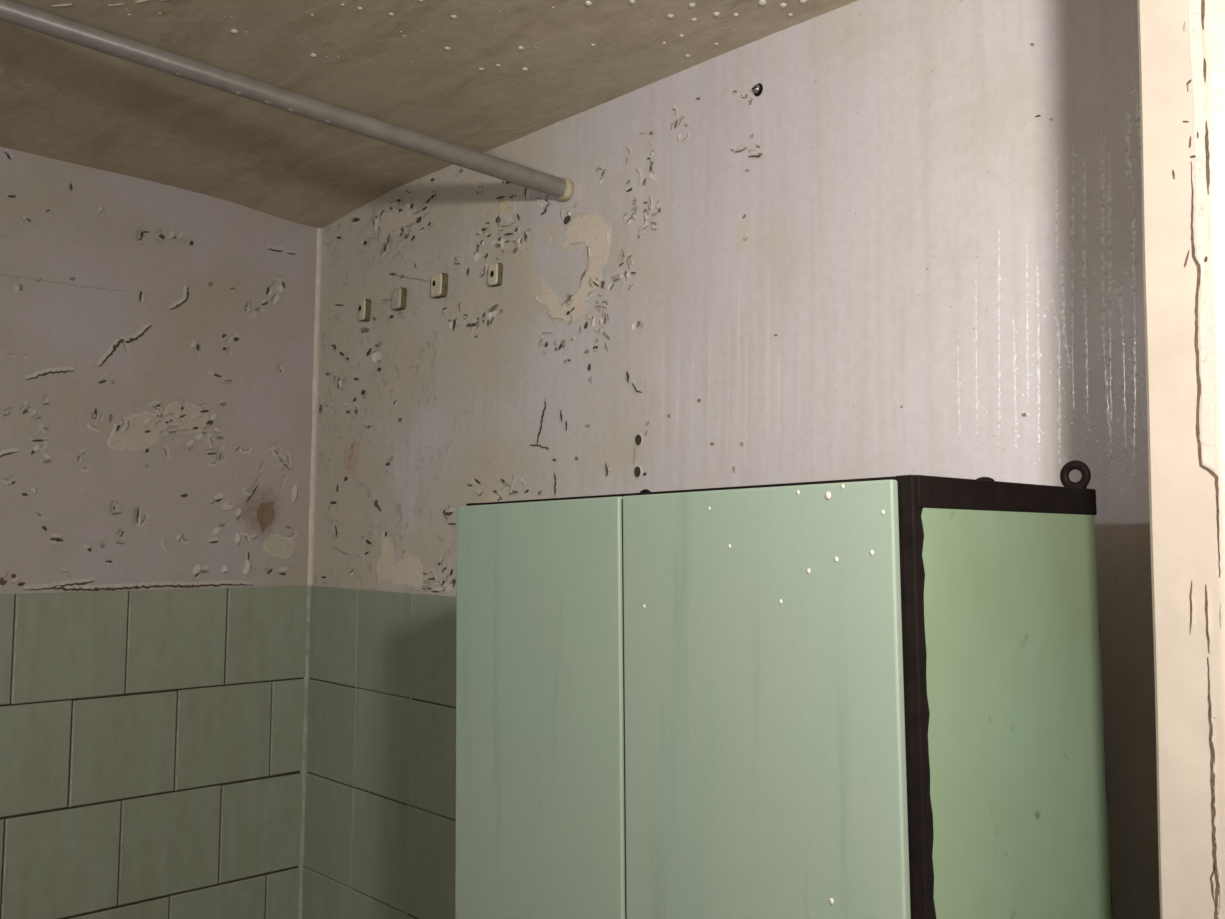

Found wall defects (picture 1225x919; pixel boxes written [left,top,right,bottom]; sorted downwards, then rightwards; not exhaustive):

crack [1184,0,1206,91]
peeling [442,300,503,341]
peeling [453,128,661,385]
leakage [957,76,1148,501]
peeling [86,340,252,468]
peeling [83,499,150,565]
peeling [192,442,298,579]
peeling [365,532,457,597]
crack [1172,120,1225,919]